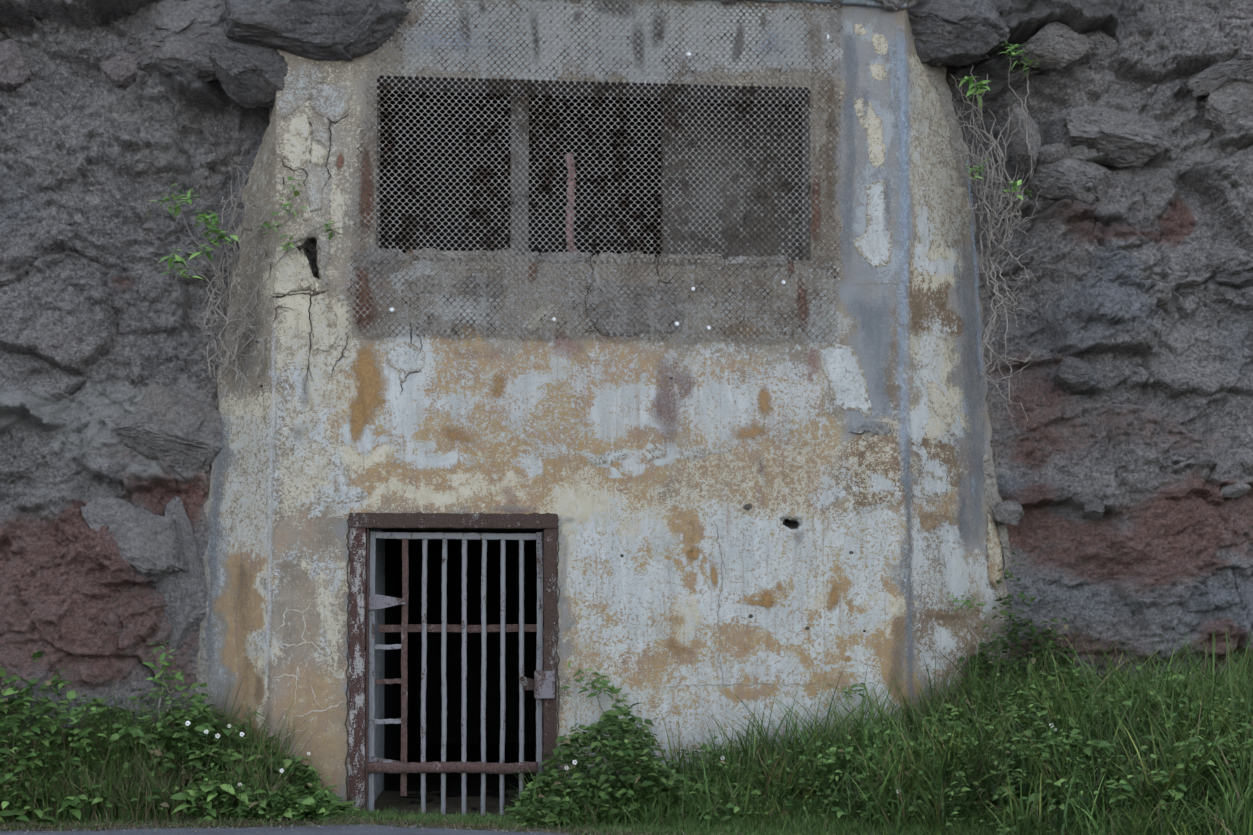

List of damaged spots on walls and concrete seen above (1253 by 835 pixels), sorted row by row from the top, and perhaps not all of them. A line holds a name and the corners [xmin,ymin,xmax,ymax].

peeling [855,23,888,81]
peeling [272,64,353,352]
crack [281,114,349,210]
peeling [852,98,893,268]
spalling [923,63,967,187]
crack [268,290,348,393]
peeling [384,342,425,387]
peeling [819,343,872,419]
peeling [305,464,369,520]
peeling [586,447,713,465]
peeling [920,469,953,500]
peeling [299,556,340,677]